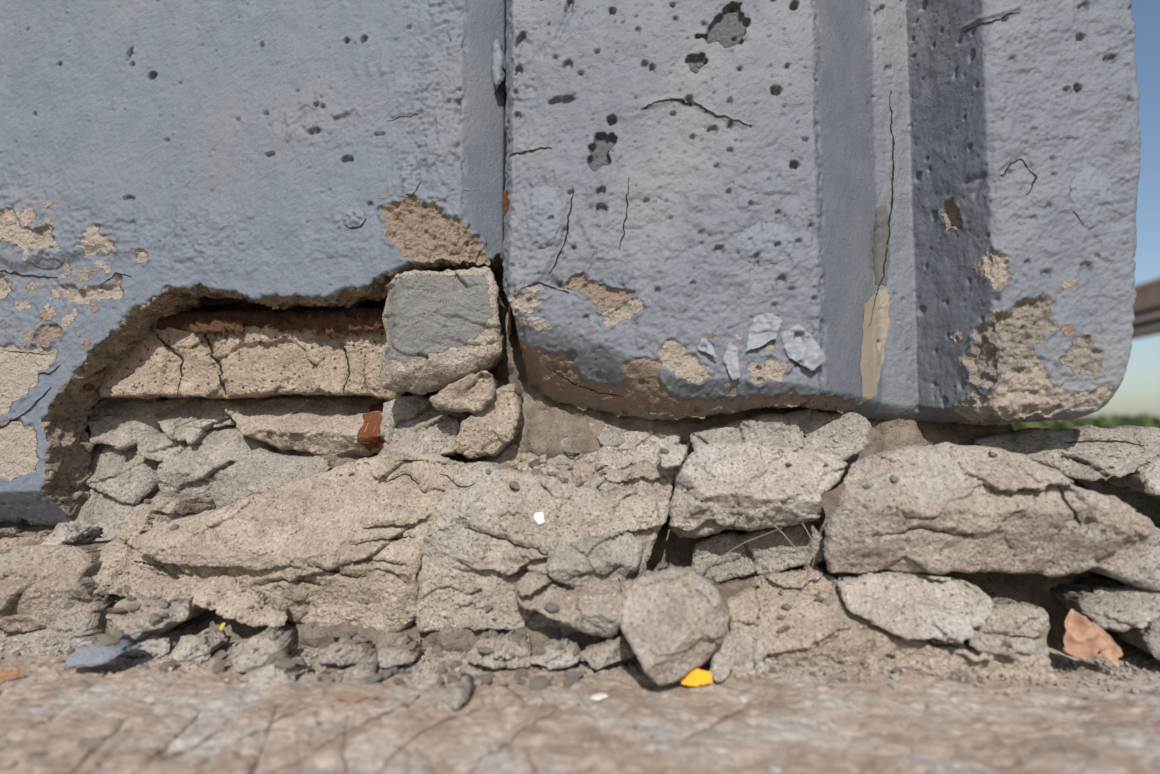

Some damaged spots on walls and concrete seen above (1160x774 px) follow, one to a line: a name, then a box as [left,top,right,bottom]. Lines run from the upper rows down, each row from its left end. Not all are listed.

crack [641,98,752,126]
crack [868,91,895,328]
spalling [940,198,962,232]
peeling [554,271,643,327]
peeling [972,247,1012,290]
crack [156,333,227,396]
spalling [0,188,504,545]
crack [342,348,350,393]
peeling [508,284,888,421]
spalling [935,280,1114,425]